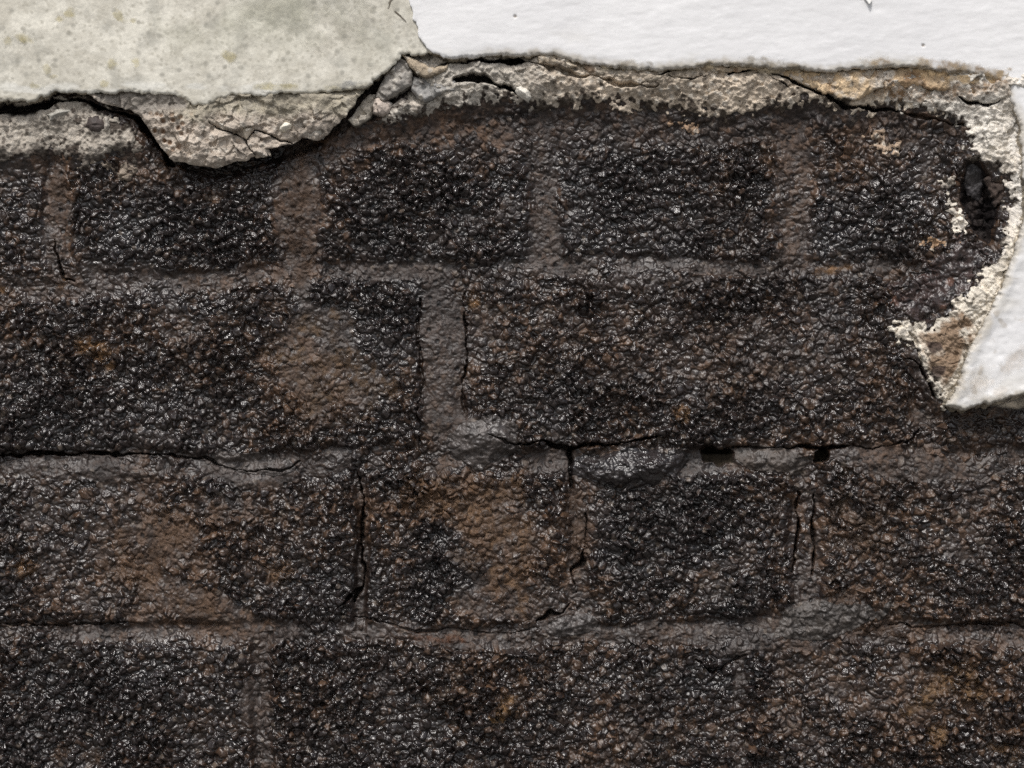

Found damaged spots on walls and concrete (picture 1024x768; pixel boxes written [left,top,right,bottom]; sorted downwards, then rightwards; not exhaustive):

crack [727,70,896,112]
crack [959,96,999,107]
crack [0,99,175,167]
crack [209,122,292,159]
spalling [0,53,1024,411]
crack [0,450,157,458]
crack [519,436,657,489]
crack [784,442,850,450]
crack [343,473,367,604]
crack [793,496,815,574]
crack [570,551,586,580]